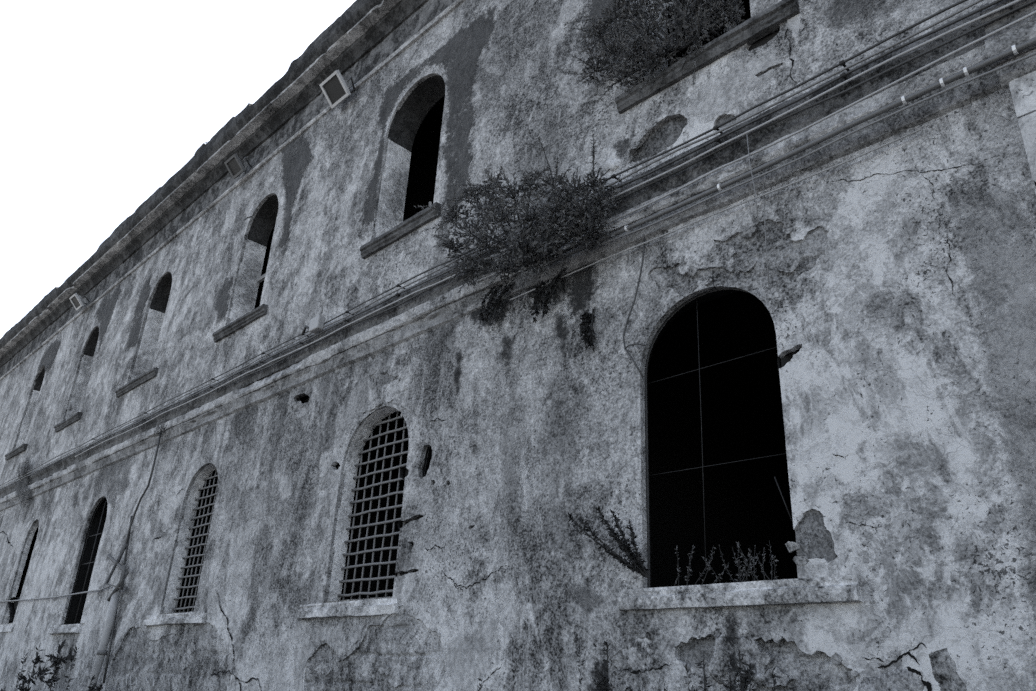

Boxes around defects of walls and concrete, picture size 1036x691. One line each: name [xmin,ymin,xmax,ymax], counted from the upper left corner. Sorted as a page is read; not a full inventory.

leakage [614,138,629,156]
flaking render [649,219,828,297]
leakage [470,261,598,373]
flaking render [785,509,838,565]
flaking render [293,606,500,691]
leakage [588,662,607,691]
flaking render [679,635,715,667]
leakage [725,614,738,691]
flaking render [757,634,859,691]
flaking render [929,648,967,691]